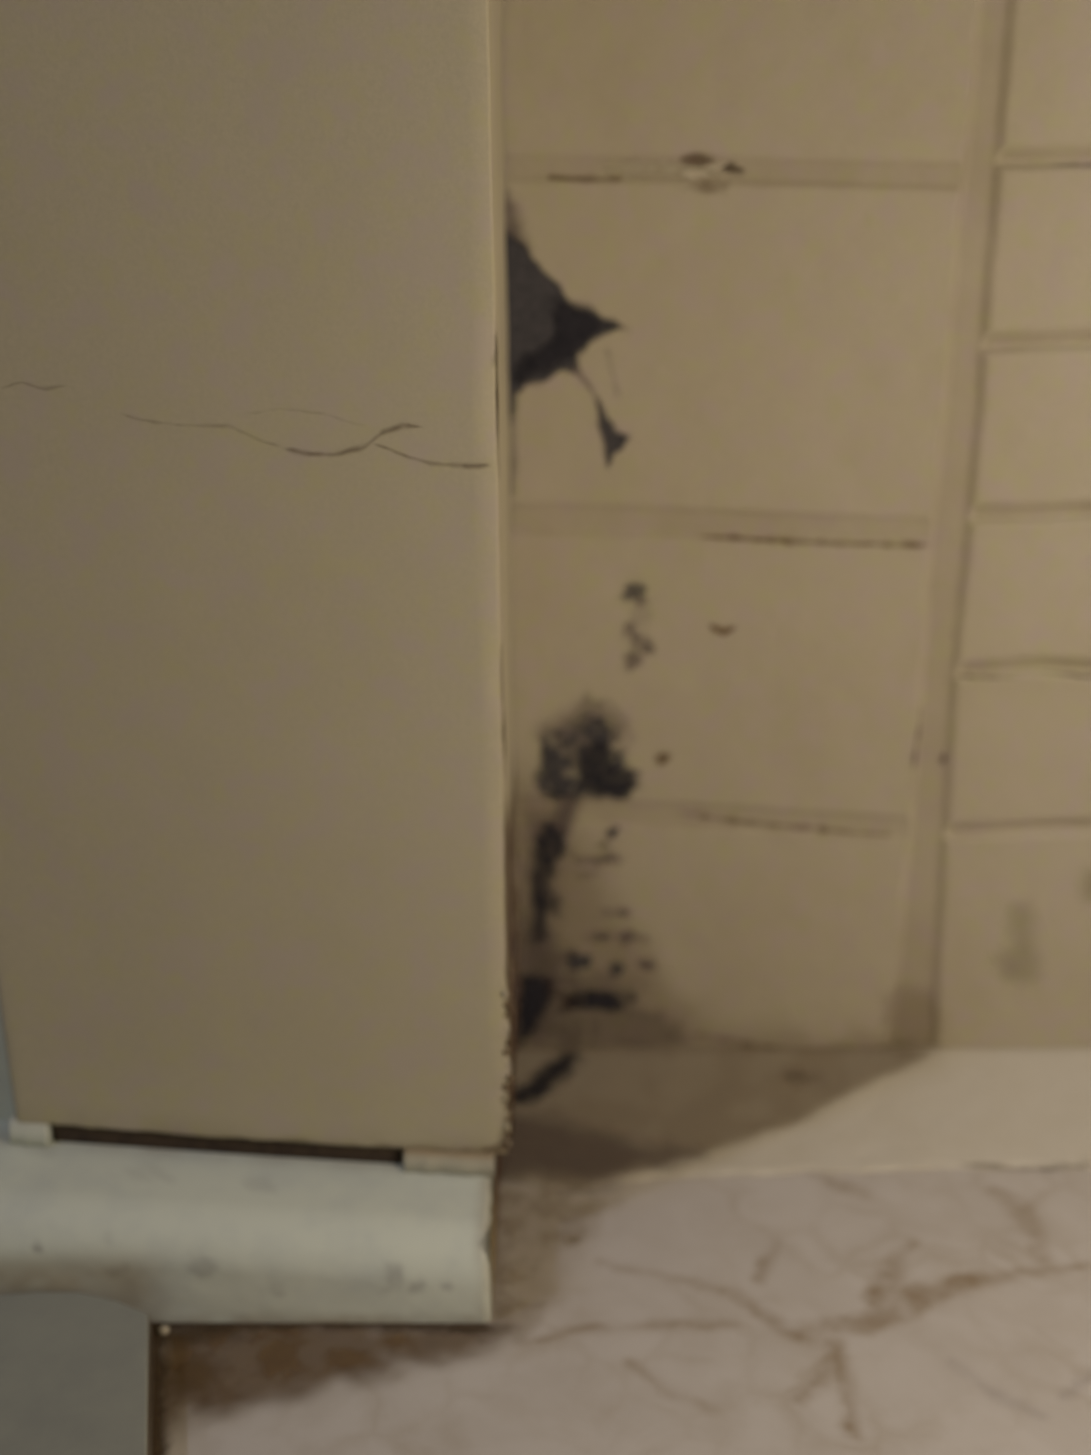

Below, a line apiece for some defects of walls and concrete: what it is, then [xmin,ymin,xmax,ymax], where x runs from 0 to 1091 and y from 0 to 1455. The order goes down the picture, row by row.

crack [289,425,419,456]
damp [533,718,638,941]
damp [519,976,549,1037]
damp [573,991,634,1010]
damp [514,1052,576,1103]